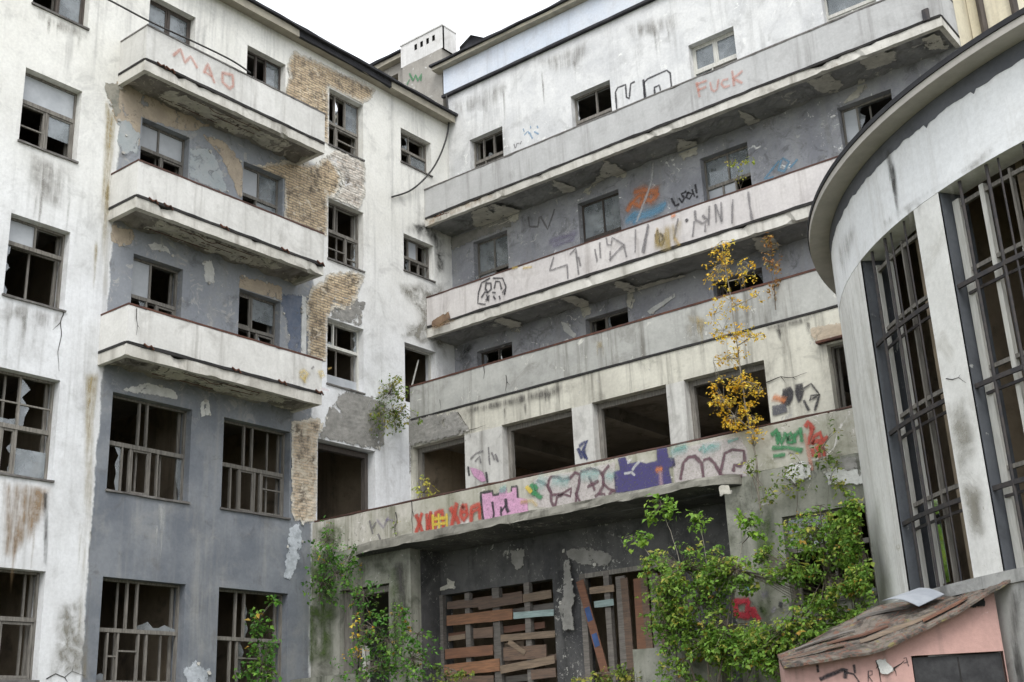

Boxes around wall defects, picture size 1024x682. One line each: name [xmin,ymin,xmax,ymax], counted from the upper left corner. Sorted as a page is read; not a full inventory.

flaking render [105,51,376,236]
flaking render [110,220,365,361]
spalling [123,366,289,417]
corrosion [7,489,44,551]
flaking render [283,391,387,579]
flaking render [785,456,863,485]
peeling [558,546,612,631]